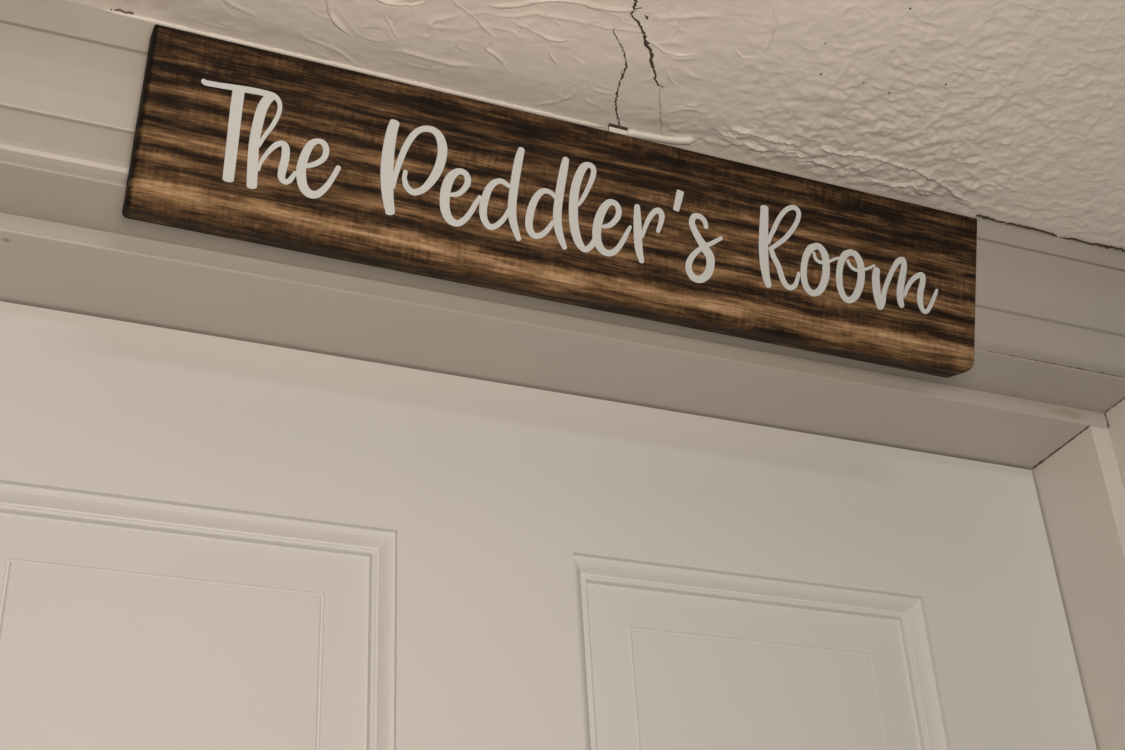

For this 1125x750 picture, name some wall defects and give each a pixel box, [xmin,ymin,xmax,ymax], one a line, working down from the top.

crack [613,0,663,134]